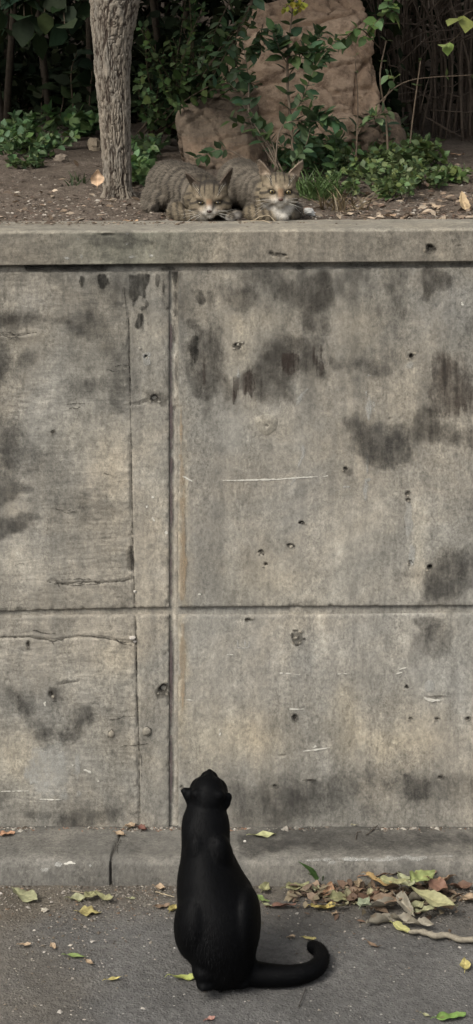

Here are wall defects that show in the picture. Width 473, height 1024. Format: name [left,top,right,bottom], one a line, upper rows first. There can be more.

water stain [129,273,150,329]
water stain [188,321,325,400]
water stain [415,354,472,442]
crack [1,290,147,806]